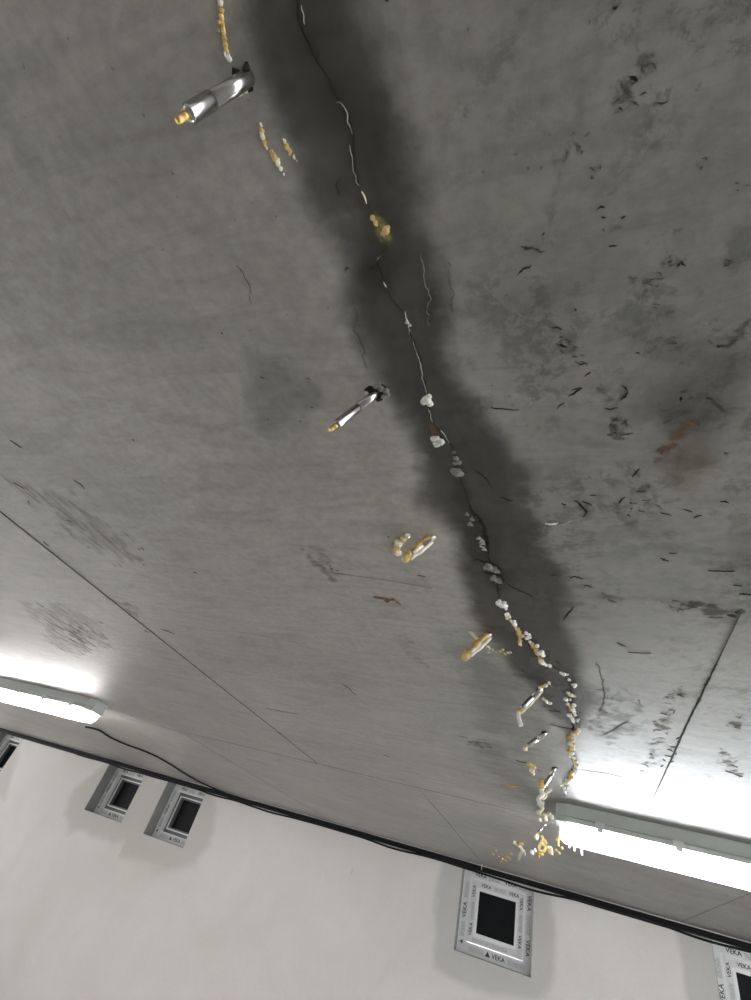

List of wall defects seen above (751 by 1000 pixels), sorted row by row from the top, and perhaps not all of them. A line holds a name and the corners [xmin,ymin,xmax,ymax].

crack [297,2,533,612]
water stain [253,0,590,822]
crack [522,637,620,790]